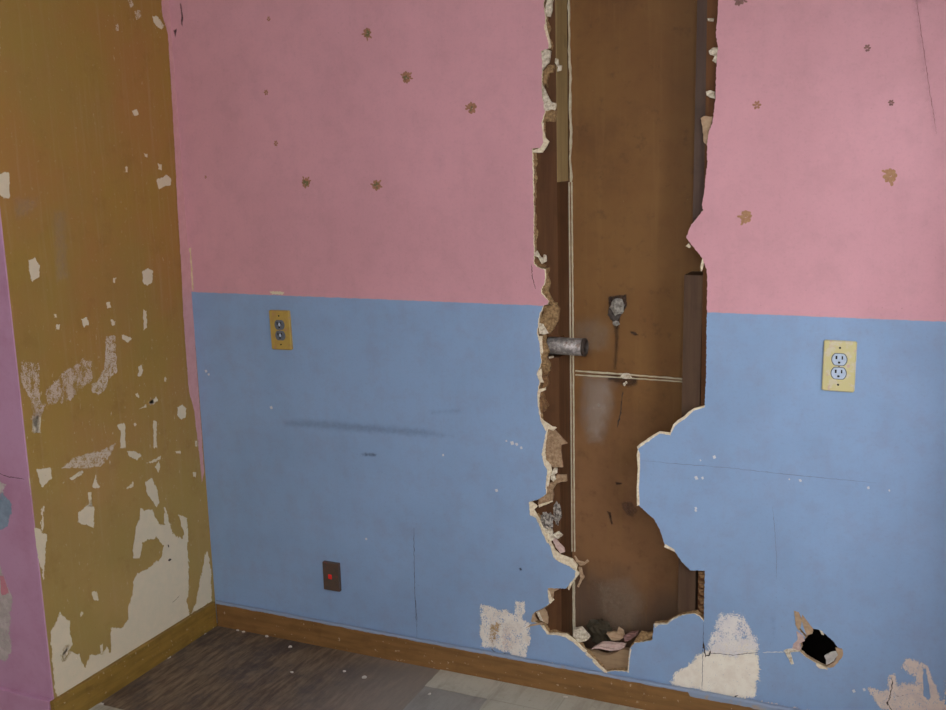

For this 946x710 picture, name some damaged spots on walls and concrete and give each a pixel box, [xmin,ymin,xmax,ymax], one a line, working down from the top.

peeling [128,0,164,29]
spalling [701,81,716,145]
peeling [0,172,10,199]
peeling [157,163,171,189]
spalling [526,0,705,673]
peeling [21,302,132,433]
peeling [0,482,12,530]
peeling [29,420,212,696]
spalling [784,611,843,670]